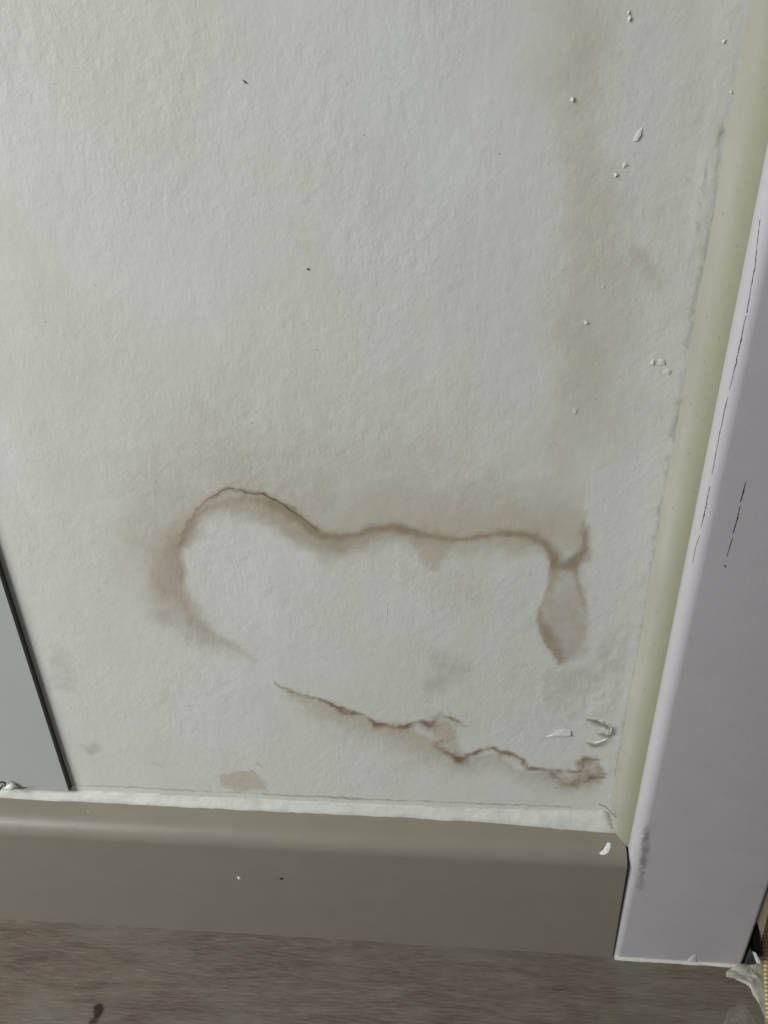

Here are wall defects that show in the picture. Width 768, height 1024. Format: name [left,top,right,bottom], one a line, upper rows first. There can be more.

damp [195,488,586,575]
damp [318,698,604,785]
peeling [588,717,614,747]